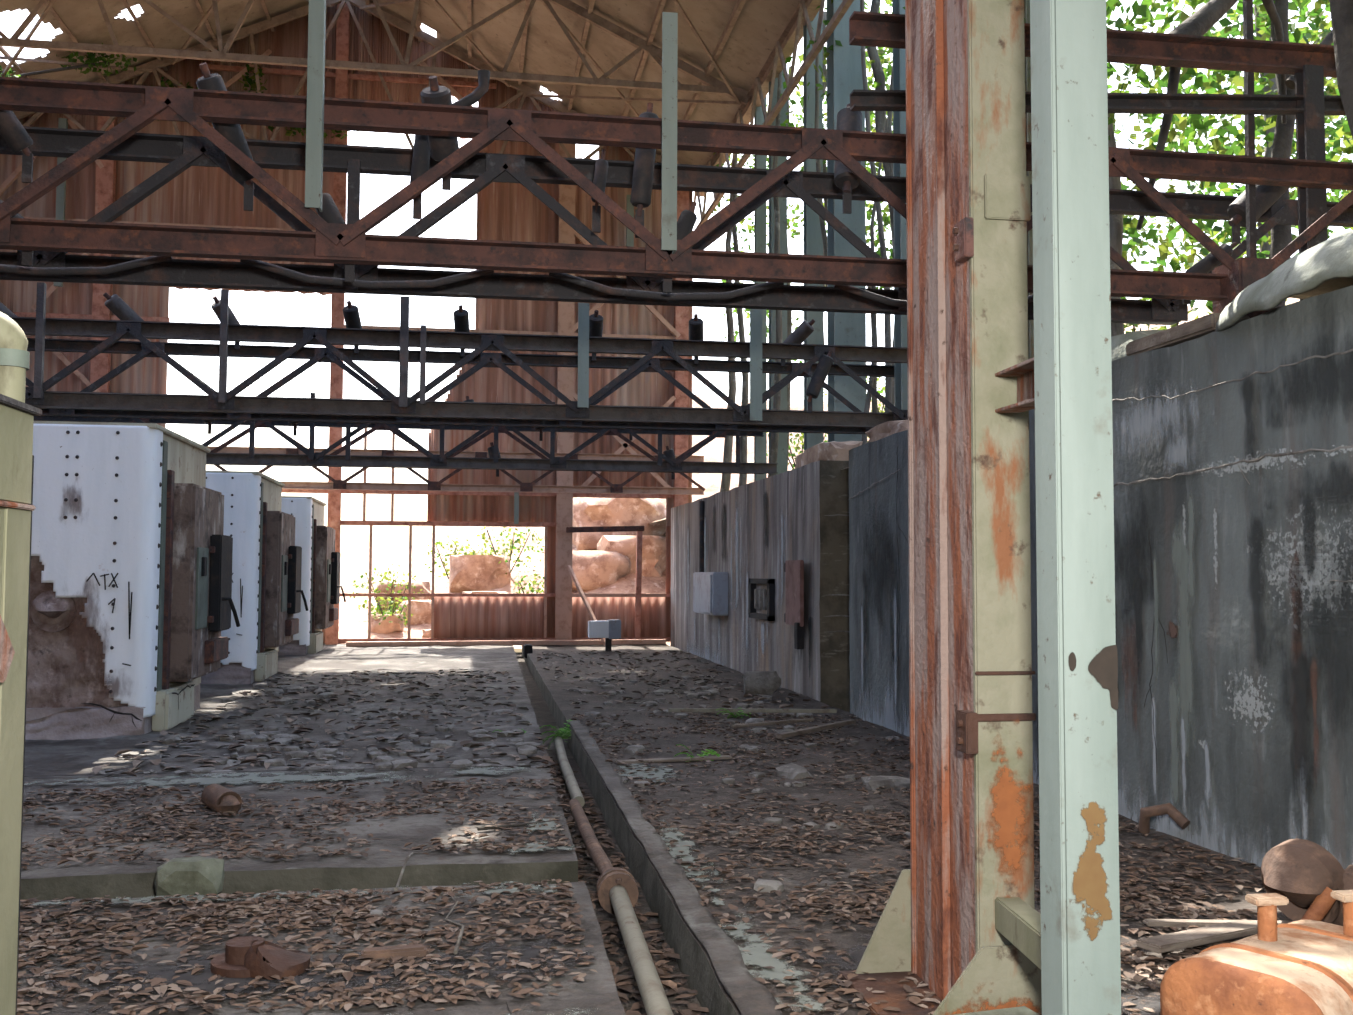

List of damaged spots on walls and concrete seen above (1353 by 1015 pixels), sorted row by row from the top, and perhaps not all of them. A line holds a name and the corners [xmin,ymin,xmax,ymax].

water stain [1304,464,1353,573]
peeling [1068,645,1118,710]
water stain [1114,496,1265,867]
water stain [1283,553,1353,839]
rust [988,748,1032,874]
peeling [1073,802,1112,941]